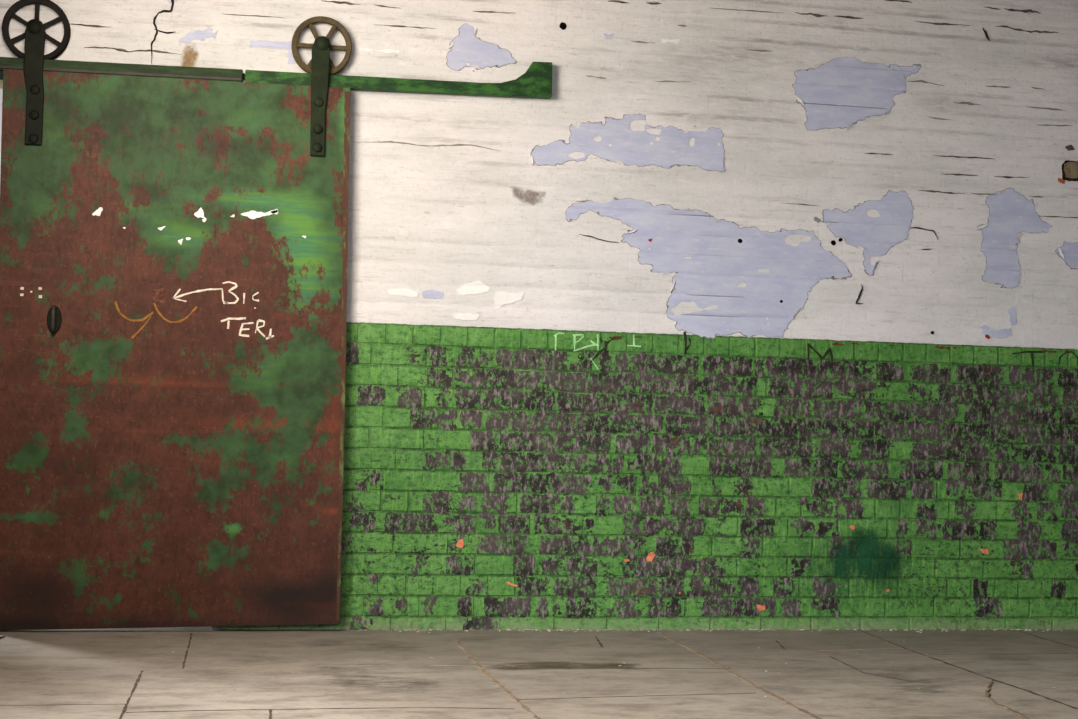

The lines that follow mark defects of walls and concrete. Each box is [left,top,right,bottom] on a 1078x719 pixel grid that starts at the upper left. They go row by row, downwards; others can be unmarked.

crack [71,0,181,64]
crack [225,12,282,20]
crack [321,0,435,29]
peeling [446,23,517,72]
peeling [792,57,922,131]
peeling [530,113,726,172]
peeling [565,190,914,339]
peeling [976,188,1052,289]
peeling [1055,241,1078,270]
peeling [980,307,1017,339]
peeling [342,342,1078,630]
crack [985,680,1029,719]